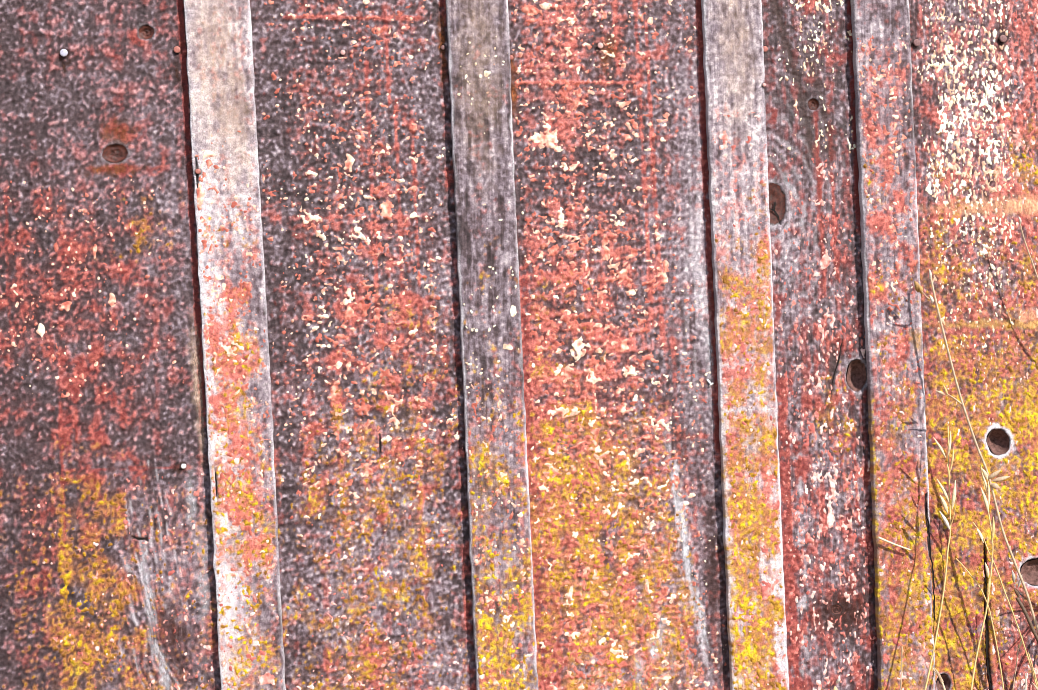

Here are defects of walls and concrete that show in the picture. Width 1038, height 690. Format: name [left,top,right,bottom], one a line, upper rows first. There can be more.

peeling [0,175,184,398]
peeling [73,0,769,690]
peeling [713,0,1038,690]
crack [926,494,935,633]
crack [984,542,992,690]